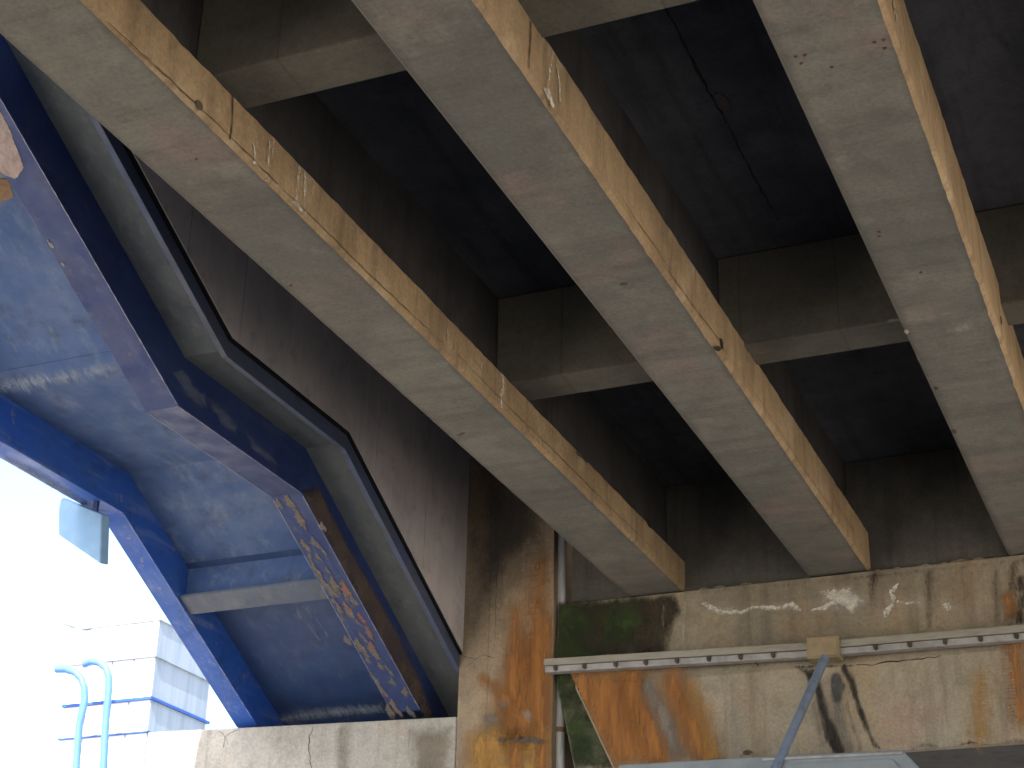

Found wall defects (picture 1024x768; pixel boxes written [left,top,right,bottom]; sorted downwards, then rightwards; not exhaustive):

peeling [0,112,24,202]
crack [665,8,779,221]
efflorescence [702,587,863,614]
leakage [883,572,931,620]
rust [481,559,552,750]
rust [571,670,715,765]
leakage [801,664,879,753]